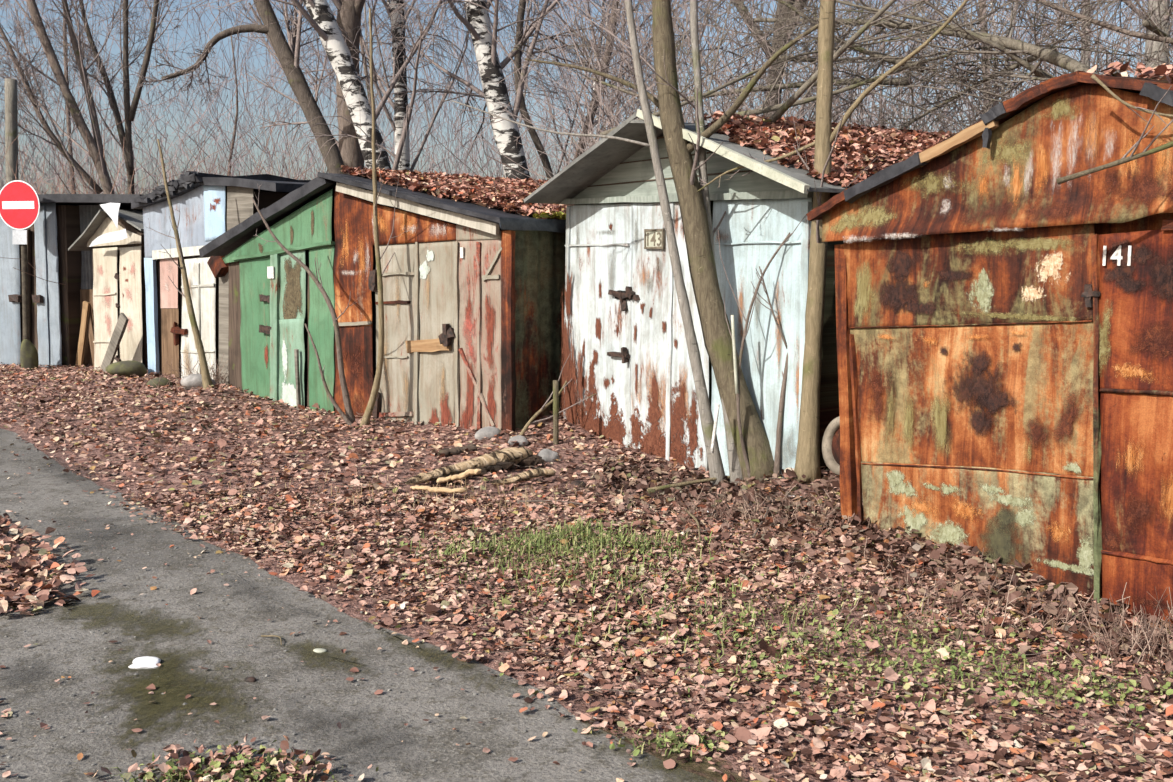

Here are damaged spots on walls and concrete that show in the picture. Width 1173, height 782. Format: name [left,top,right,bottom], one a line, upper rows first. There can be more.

corrosion [960,148,1071,223]
corrosion [1105,139,1172,208]
peeling [282,338,302,408]
peeling [460,293,496,430]
peeling [559,272,705,467]
corrosion [868,372,896,432]
corrosion [943,335,1015,436]
corrosion [1025,394,1078,446]
corrosion [1115,364,1151,378]
corrosion [1125,446,1143,470]
corrosion [953,502,981,519]
corrosion [1162,474,1173,517]